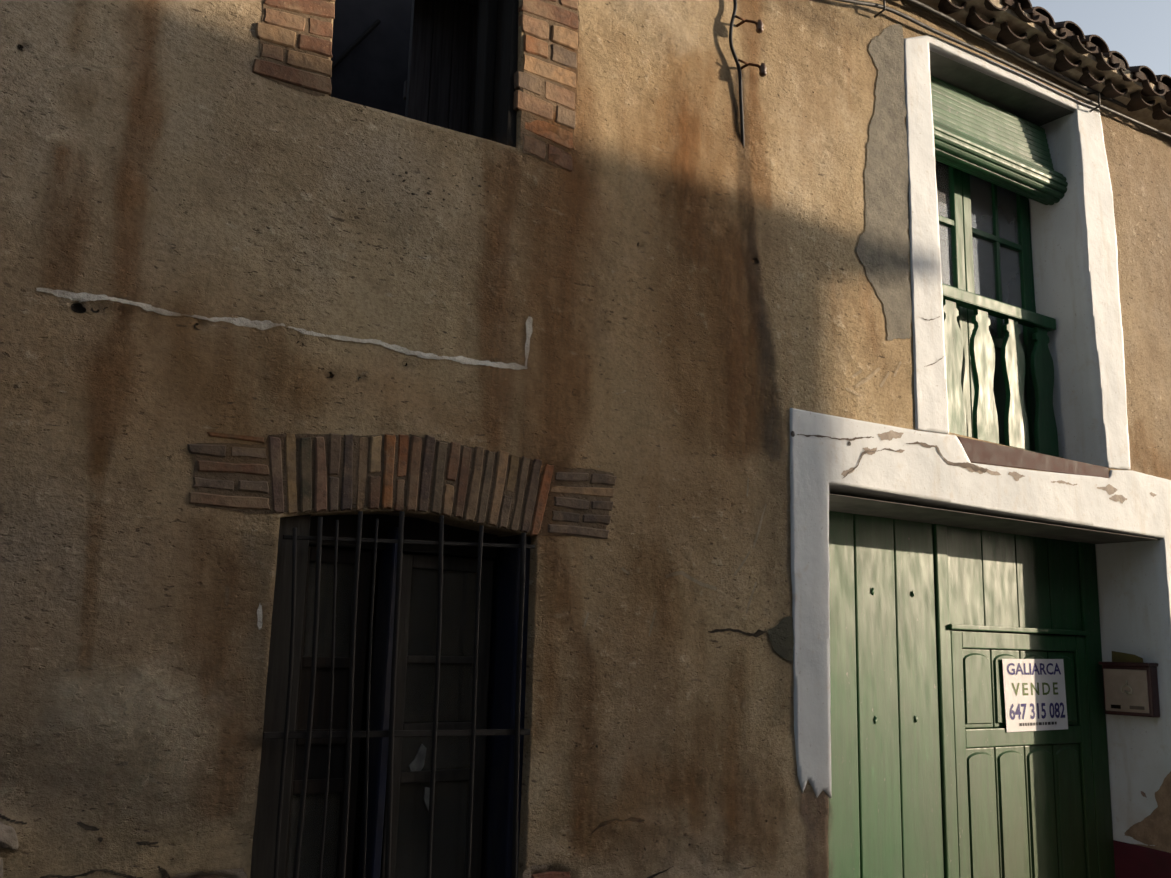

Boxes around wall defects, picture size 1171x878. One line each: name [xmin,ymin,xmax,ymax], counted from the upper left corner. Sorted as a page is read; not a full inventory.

crack [36,288,533,370]
crack [791,431,1001,478]
spalling [708,616,794,663]
peeling [1125,771,1171,853]
spalling [172,868,247,878]